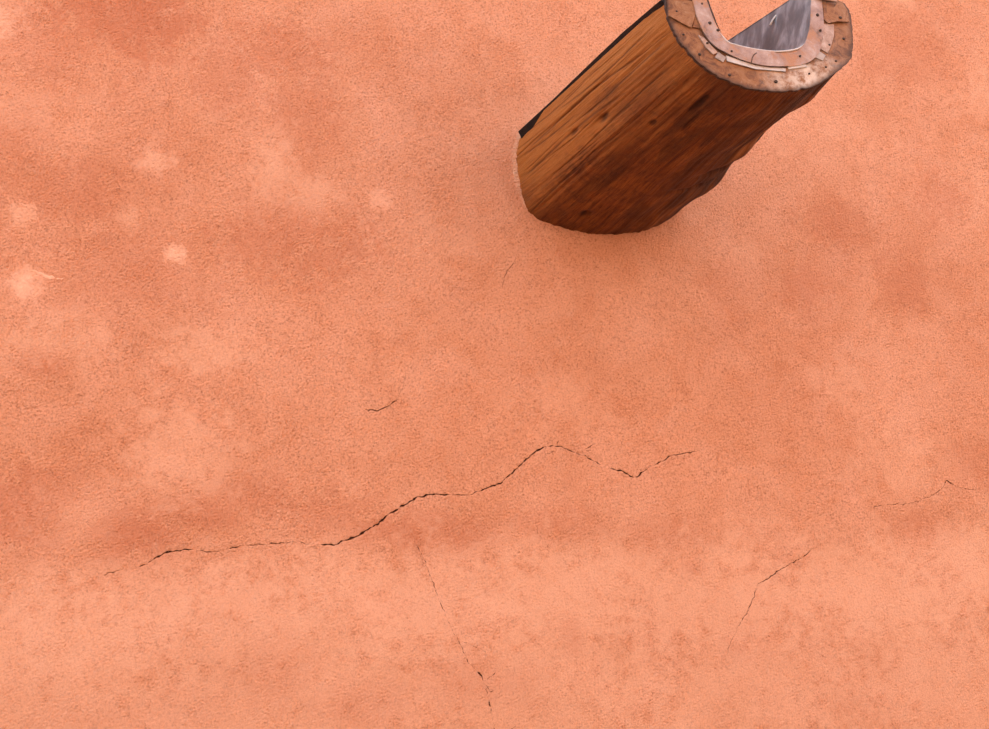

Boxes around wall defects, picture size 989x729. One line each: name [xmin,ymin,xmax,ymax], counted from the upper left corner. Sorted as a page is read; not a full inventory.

crack [105,442,694,575]